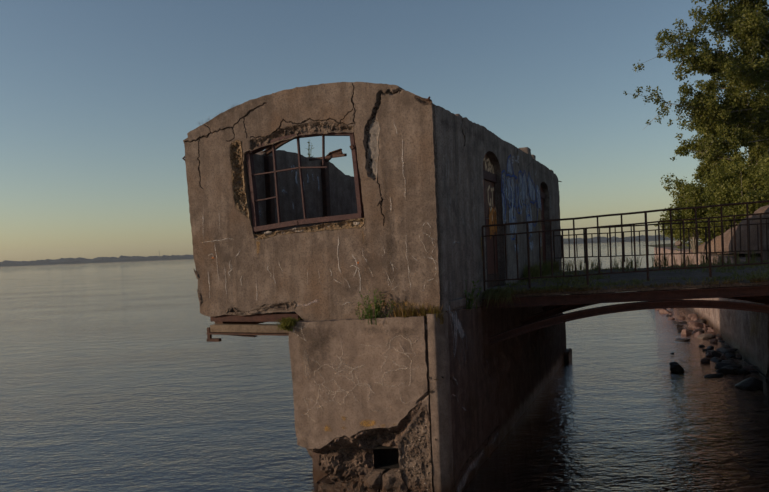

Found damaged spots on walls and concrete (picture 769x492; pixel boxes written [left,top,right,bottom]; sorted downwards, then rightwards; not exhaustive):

crack [187,107,258,186]
crack [254,90,400,220]
spalling [368,117,380,178]
crack [293,326,452,421]
spalling [309,400,433,492]